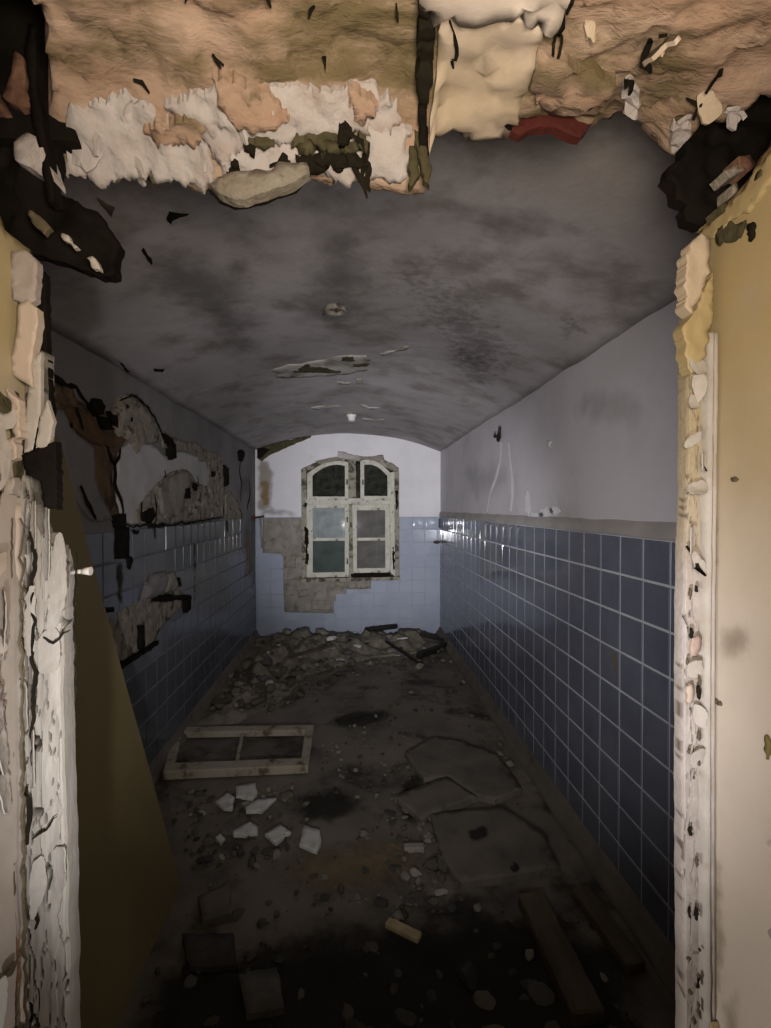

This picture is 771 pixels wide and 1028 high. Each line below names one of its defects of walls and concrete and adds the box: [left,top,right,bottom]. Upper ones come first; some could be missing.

peeling [0,23,412,283]
flaking render [504,107,595,145]
spalling [621,33,681,120]
spalling [657,67,771,247]
peeling [271,345,409,385]
peeling [0,392,17,499]
spalling [54,374,229,528]
spalling [105,569,192,669]
peeling [263,518,371,613]
peeling [0,552,12,814]
peeling [685,627,723,779]
peeling [763,735,771,760]